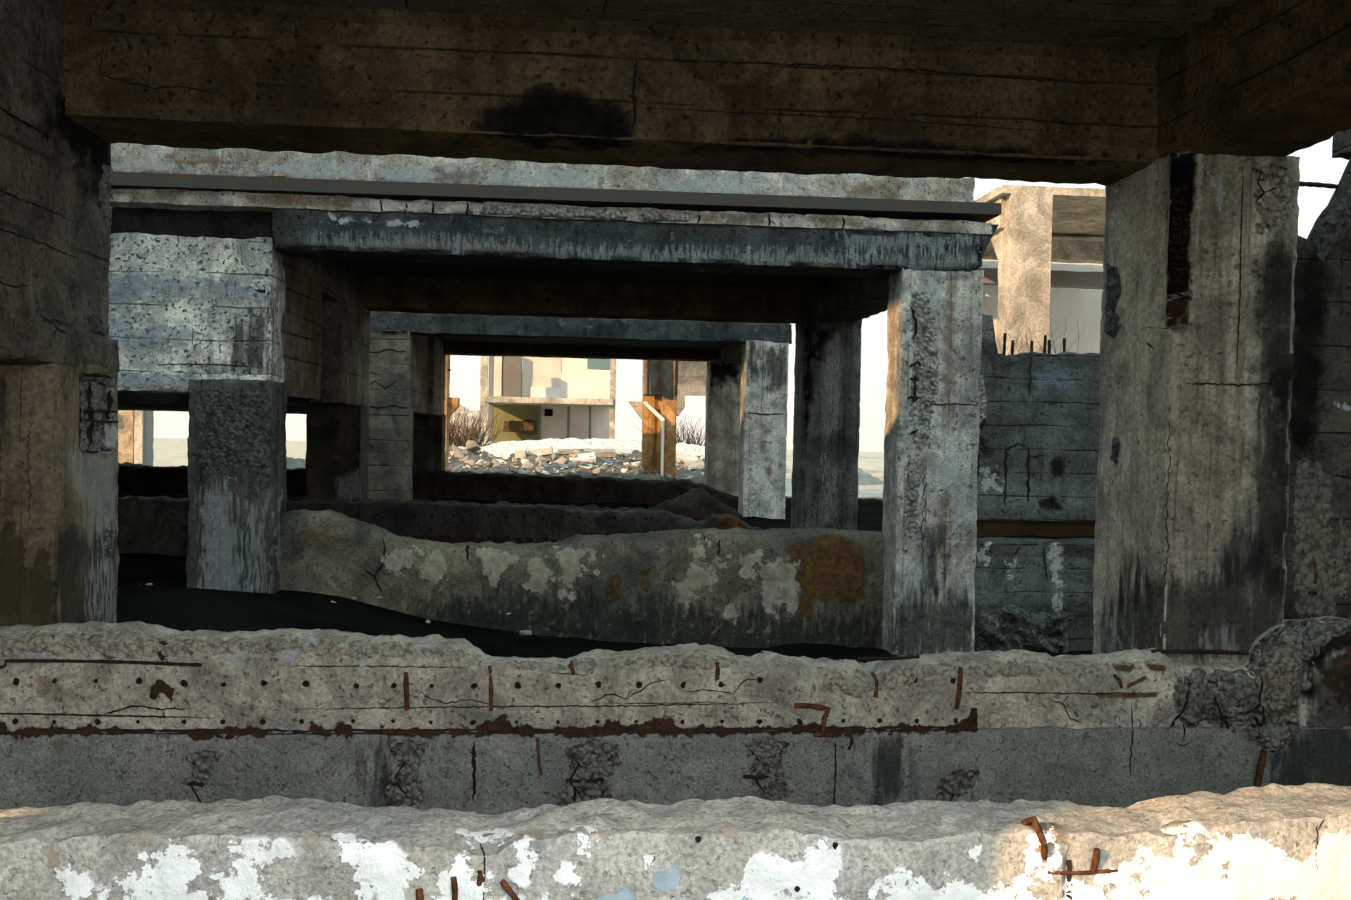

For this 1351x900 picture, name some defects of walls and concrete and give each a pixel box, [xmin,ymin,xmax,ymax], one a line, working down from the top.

crack [1187,165,1289,387]
crack [1163,414,1177,589]
leakage [0,521,142,660]
peeling [671,530,801,620]
corrosion [0,721,123,740]
crack [0,705,195,718]
corrosion [187,725,273,740]
corrosion [309,721,356,740]
corrosion [378,707,977,739]
peeling [54,837,334,900]
peeling [331,824,599,900]
peeling [706,816,1351,900]